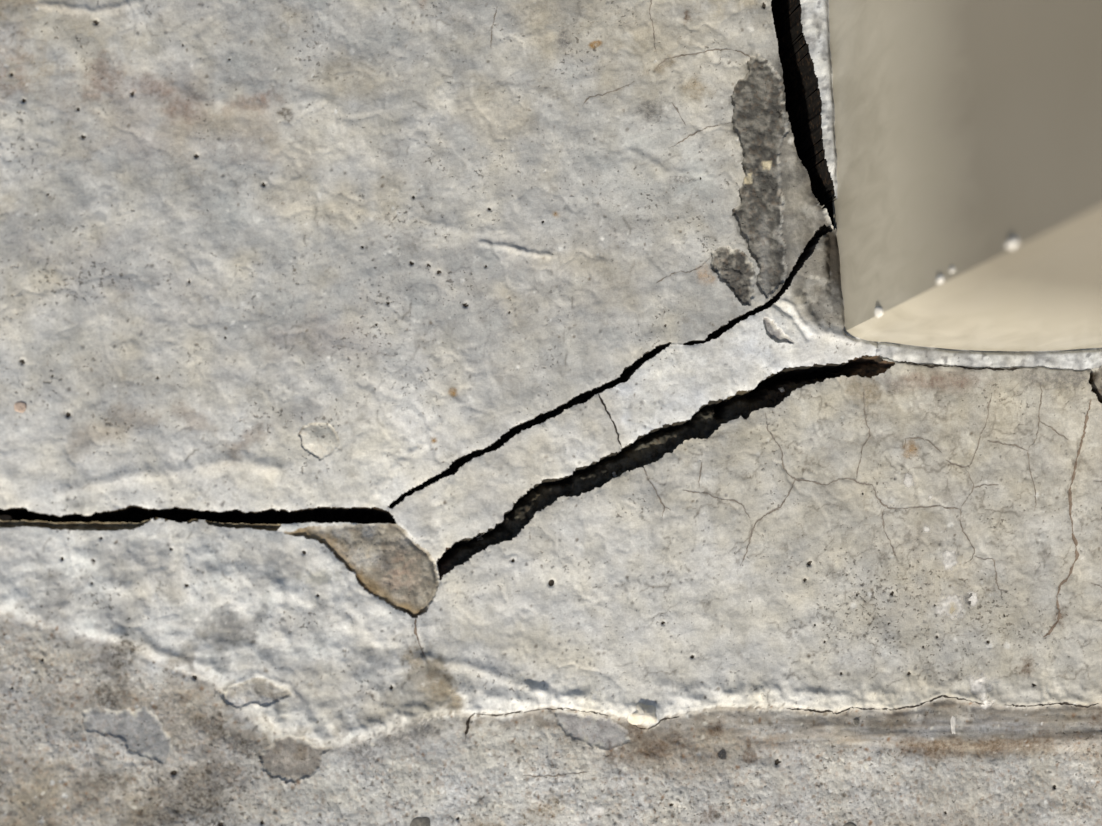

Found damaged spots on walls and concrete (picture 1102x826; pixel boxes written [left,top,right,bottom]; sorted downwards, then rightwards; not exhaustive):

spalling [710,53,790,306]
crack [0,0,1102,637]
spalling [1088,365,1102,403]
spalling [282,522,440,618]